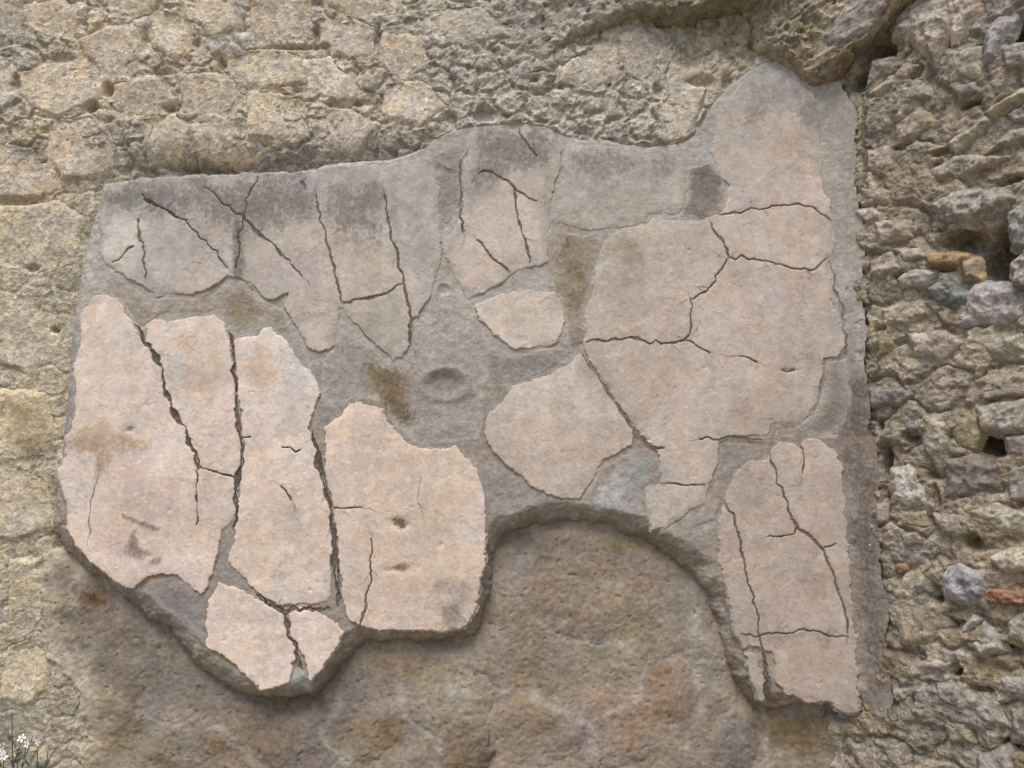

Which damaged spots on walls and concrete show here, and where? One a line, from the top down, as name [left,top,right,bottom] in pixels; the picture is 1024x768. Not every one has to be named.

crack [96,161,416,359]
crack [431,146,550,283]
crack [135,324,248,530]
crack [256,430,379,668]
flaking render [40,69,861,768]
crack [569,200,868,697]